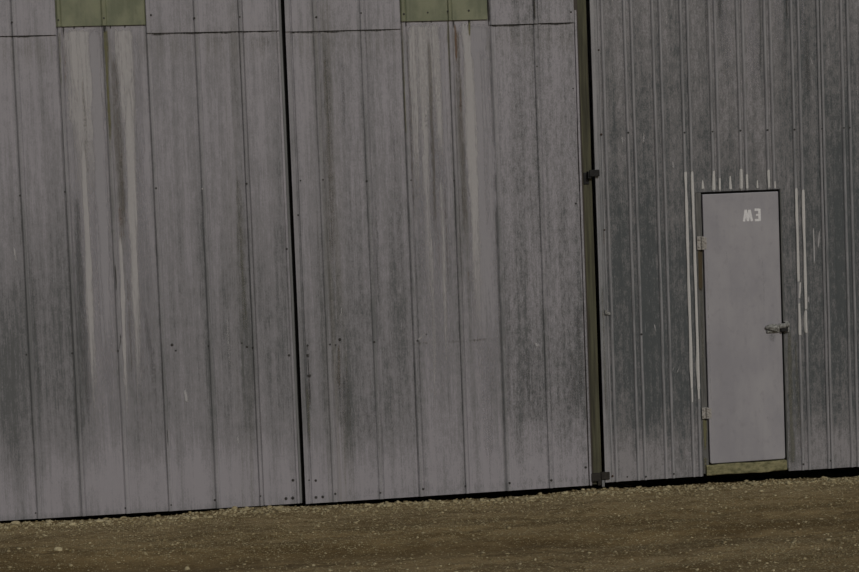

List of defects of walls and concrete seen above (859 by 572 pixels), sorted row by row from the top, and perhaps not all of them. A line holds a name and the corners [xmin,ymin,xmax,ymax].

water stain [63,25,151,400]
water stain [402,0,535,450]